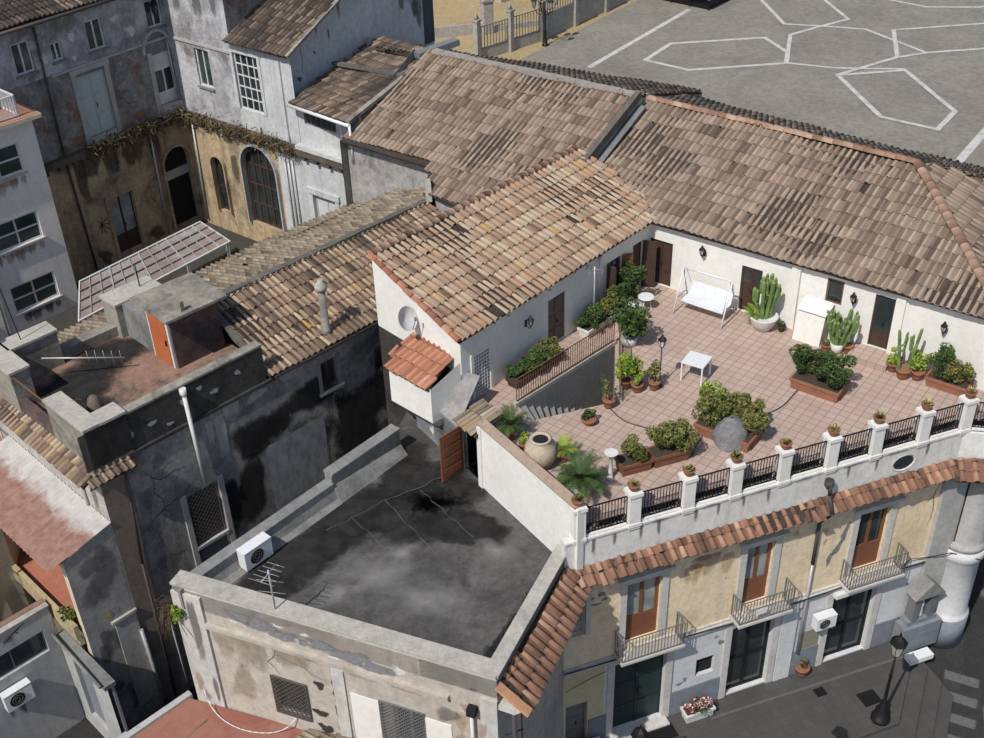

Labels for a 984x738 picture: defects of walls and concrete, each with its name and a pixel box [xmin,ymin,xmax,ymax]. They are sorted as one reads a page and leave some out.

damp [205,345,387,525]
damp [238,444,505,599]
crack [326,477,473,556]
damp [80,545,114,604]
flaking render [225,610,406,676]